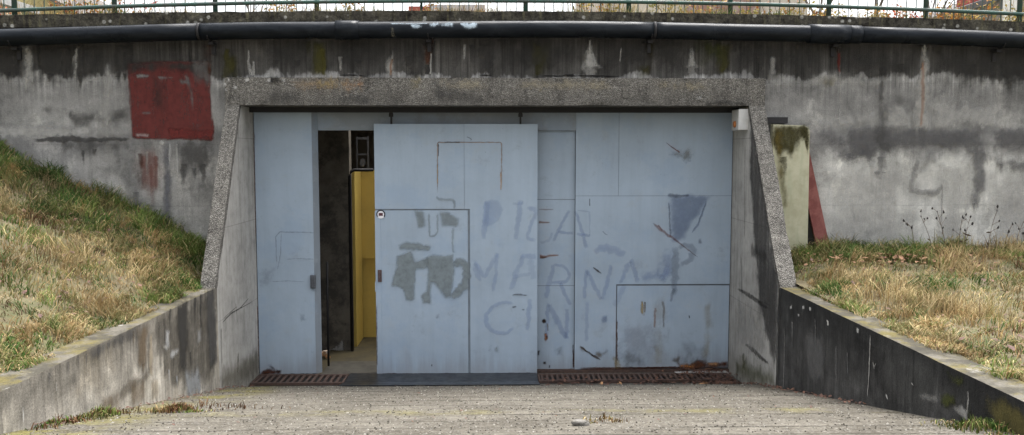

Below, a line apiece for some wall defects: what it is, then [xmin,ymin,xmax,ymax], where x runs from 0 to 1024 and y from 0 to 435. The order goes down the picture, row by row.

damp [0,44,131,98]
damp [586,41,681,69]
damp [0,112,127,157]
damp [849,45,1024,208]
damp [160,141,209,224]
rust [573,322,727,370]